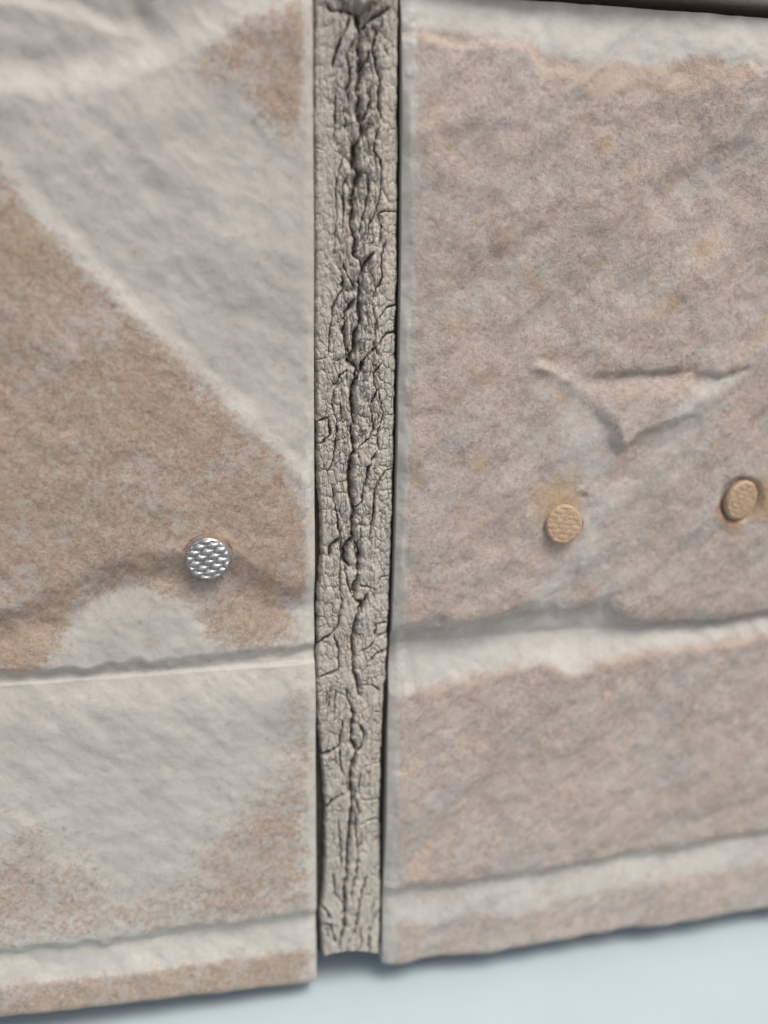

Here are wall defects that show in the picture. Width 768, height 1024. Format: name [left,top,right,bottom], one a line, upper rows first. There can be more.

crack [316,5,396,950]